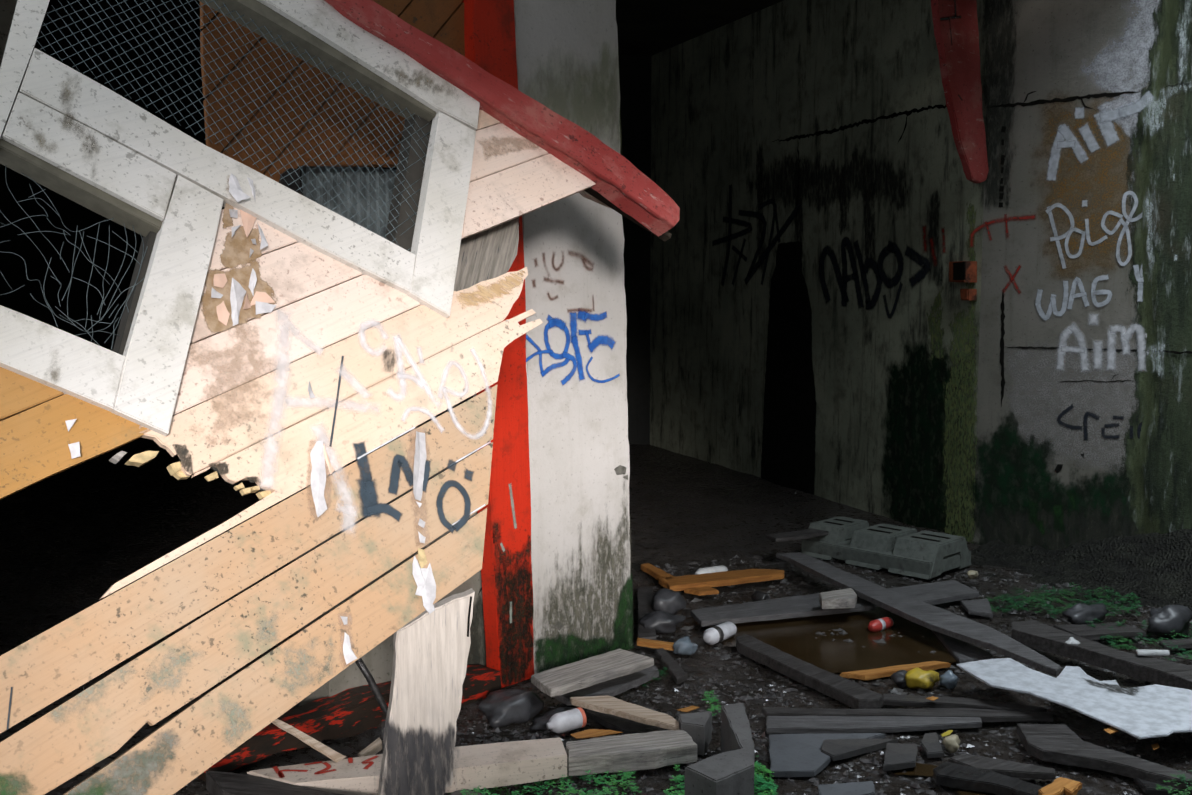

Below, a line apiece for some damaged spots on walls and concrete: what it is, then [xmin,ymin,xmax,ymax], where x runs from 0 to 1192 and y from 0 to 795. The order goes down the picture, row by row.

leakage [1084,0,1192,144]
crack [989,82,1192,207]
leakage [1145,195,1154,264]
leakage [943,282,978,482]
crack [1000,292,1192,407]